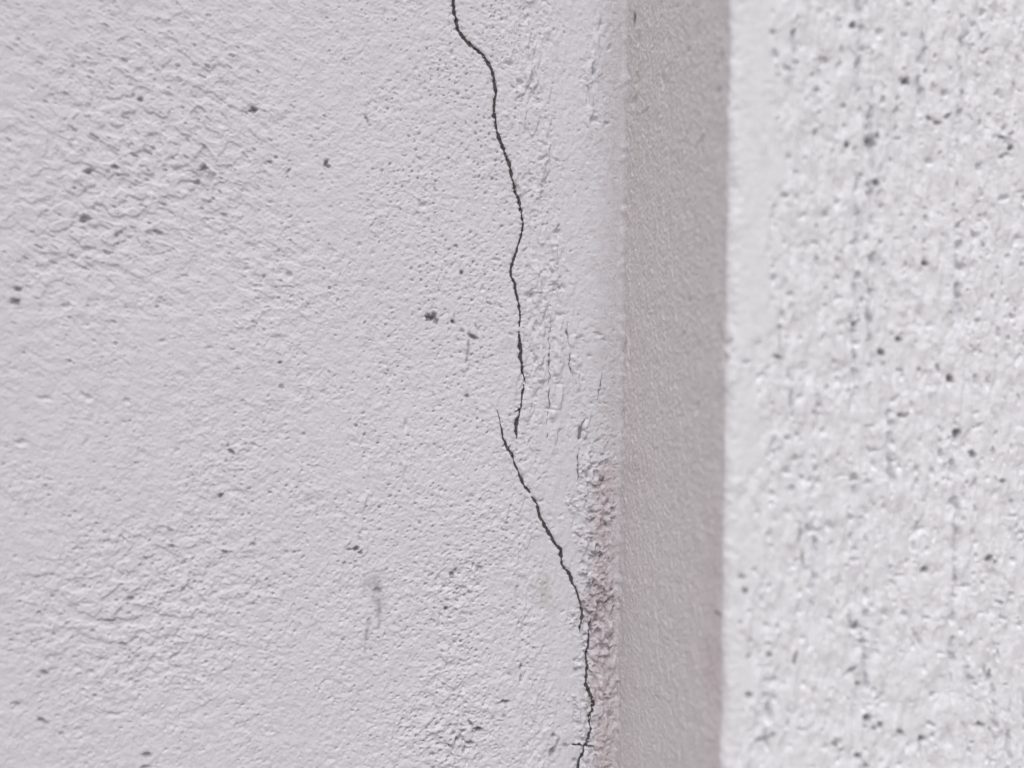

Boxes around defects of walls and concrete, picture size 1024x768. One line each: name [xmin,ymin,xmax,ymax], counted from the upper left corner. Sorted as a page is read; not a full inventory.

crack [451,0,595,768]
crack [576,377,602,479]